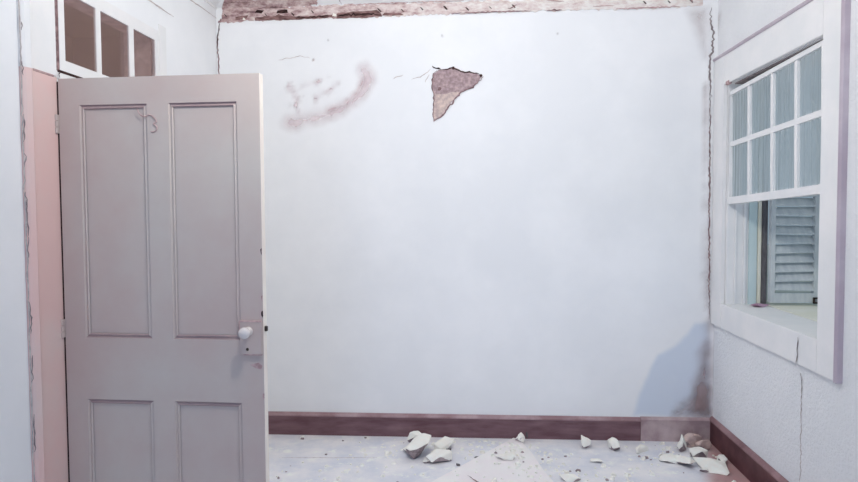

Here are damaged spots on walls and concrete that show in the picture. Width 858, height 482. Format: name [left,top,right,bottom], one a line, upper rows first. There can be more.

crack [191,0,226,74]
peeling [411,66,483,122]
crack [707,8,715,317]
leakage [630,318,714,418]
crack [795,337,803,482]